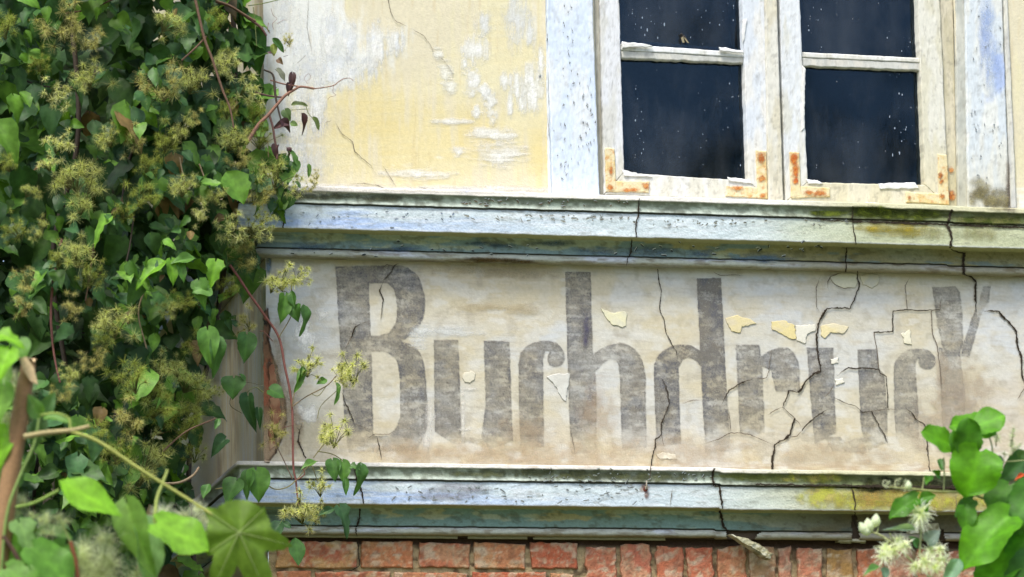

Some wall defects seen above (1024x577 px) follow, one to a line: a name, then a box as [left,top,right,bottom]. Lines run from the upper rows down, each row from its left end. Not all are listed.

peeling [289,0,636,223]
crack [626,198,640,266]
corrosion [791,154,826,196]
leakage [810,165,1021,238]
crack [345,263,399,349]
spalling [601,308,627,328]
crack [657,269,677,355]
spalling [771,320,848,344]
spalling [546,373,570,402]
crack [705,206,1024,532]
crack [649,379,693,503]
leakage [719,473,986,512]